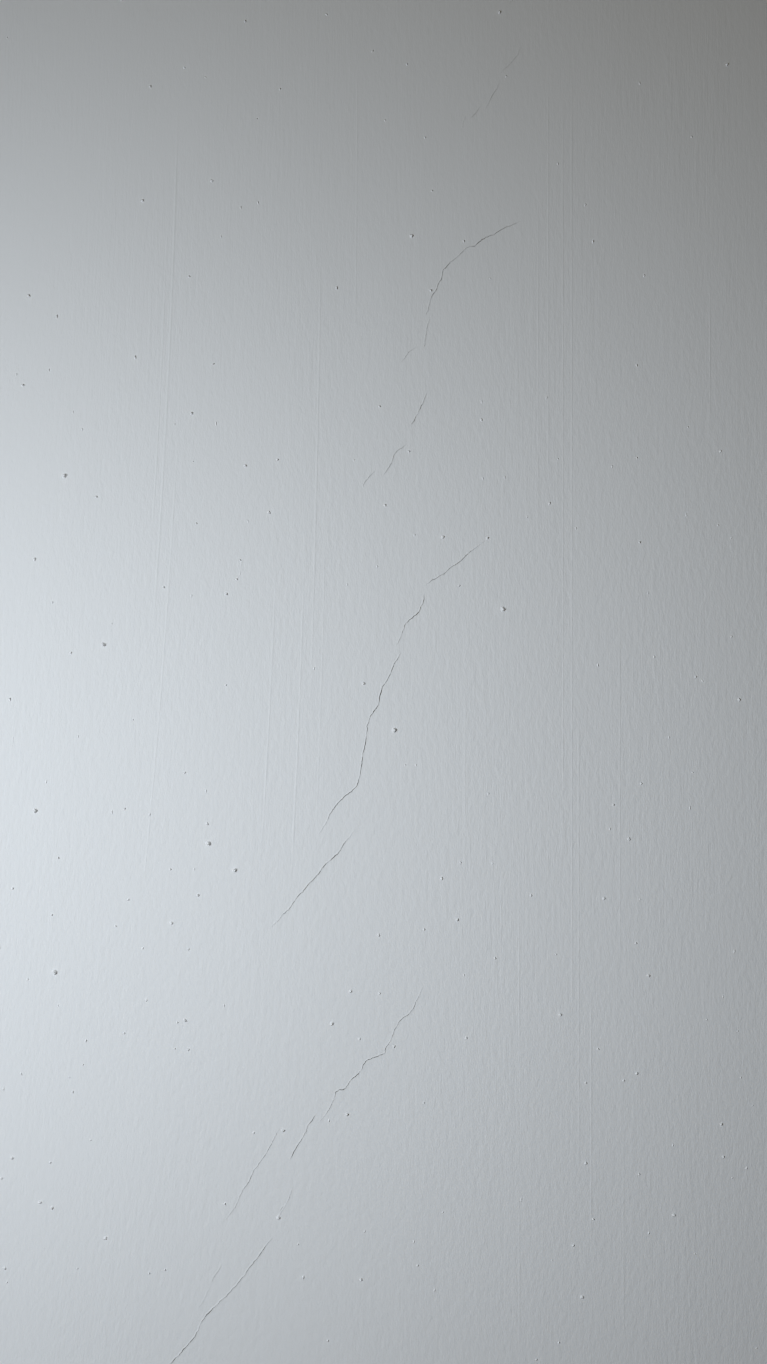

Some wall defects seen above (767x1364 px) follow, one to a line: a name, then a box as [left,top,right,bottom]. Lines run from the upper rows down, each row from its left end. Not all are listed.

crack [362,390,428,489]
crack [401,221,520,362]
crack [271,540,485,927]
crack [169,986,423,1364]